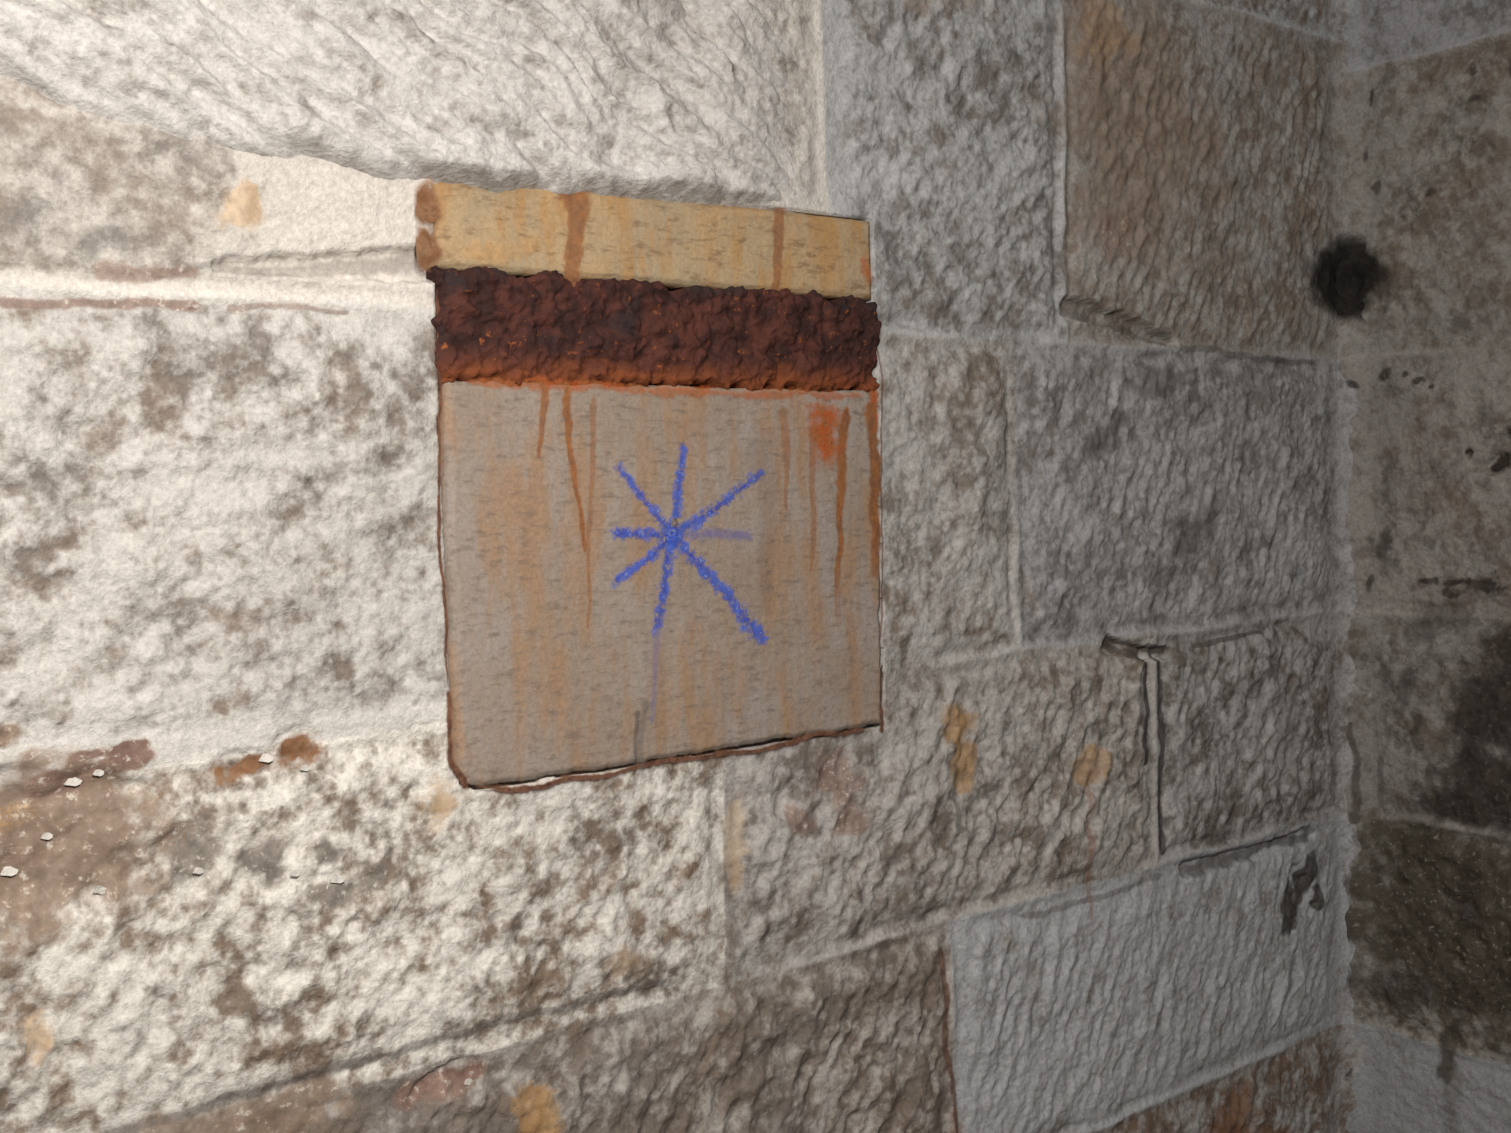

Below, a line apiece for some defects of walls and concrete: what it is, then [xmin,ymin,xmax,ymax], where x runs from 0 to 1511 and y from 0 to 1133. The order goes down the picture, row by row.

crack [1102,632,1311,874]
leakage [1343,796,1511,1081]